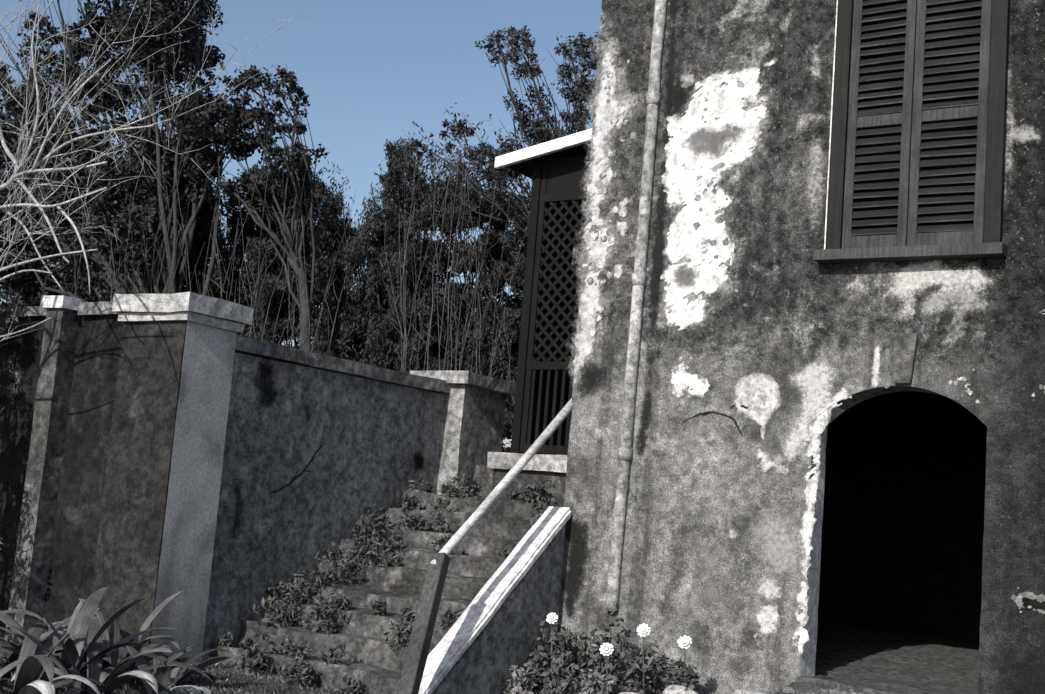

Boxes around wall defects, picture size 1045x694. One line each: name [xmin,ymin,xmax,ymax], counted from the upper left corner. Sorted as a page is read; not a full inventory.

water stain [661,0,687,147]
peeling [658,56,777,330]
water stain [807,144,823,223]
water stain [650,161,667,333]
water stain [636,347,654,455]
peeling [671,356,710,398]
crack [683,404,748,436]
water stain [784,362,833,460]
crack [268,445,322,506]
water stain [562,520,588,616]
water stain [755,514,802,598]
peeling [732,373,852,655]